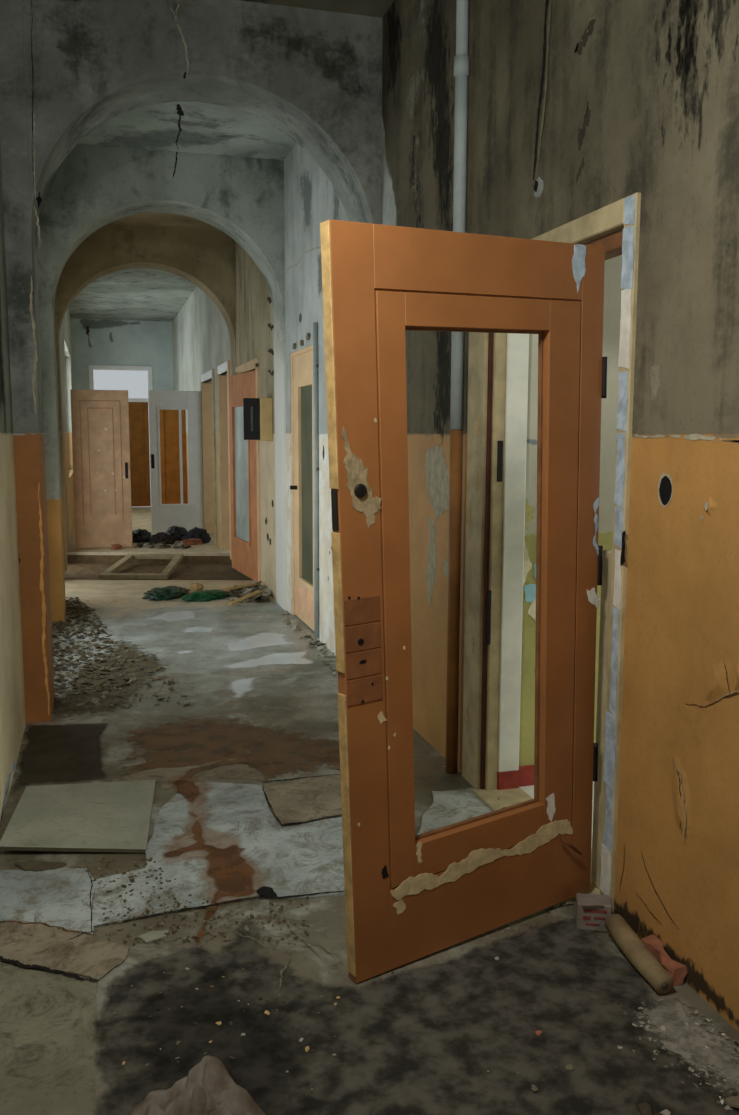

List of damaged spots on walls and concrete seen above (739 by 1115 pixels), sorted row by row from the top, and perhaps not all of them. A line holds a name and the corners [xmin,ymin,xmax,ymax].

crack [170,4,189,178]
efflorescence [381,117,396,226]
damp [384,1,402,95]
damp [423,0,455,230]
damp [655,0,735,147]
damp [433,331,451,441]
peeling [138,930,169,943]
damp [94,902,739,1115]